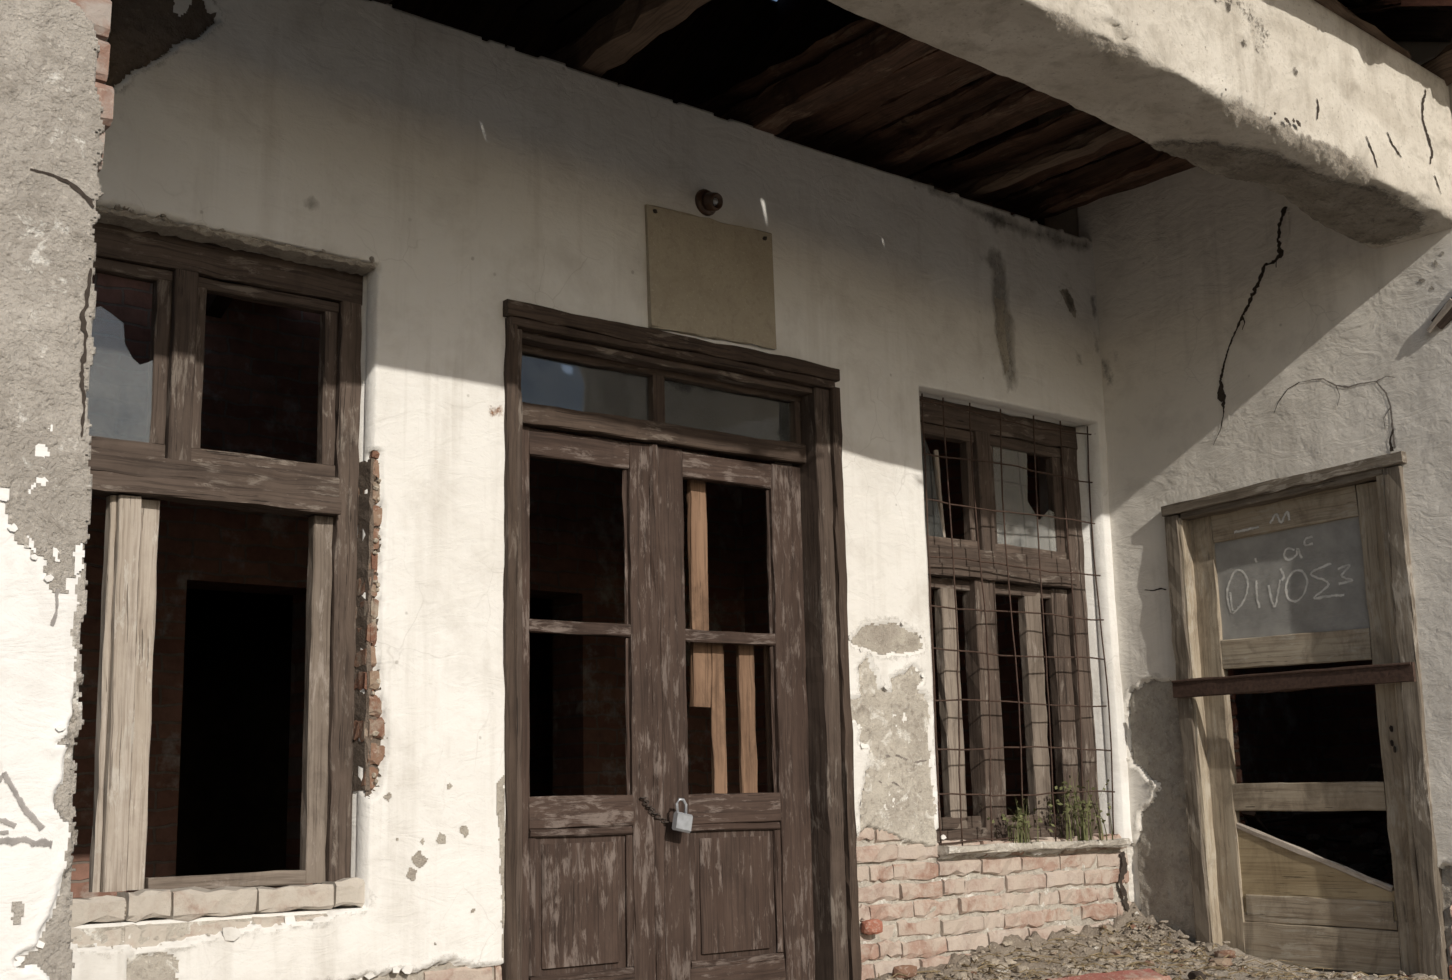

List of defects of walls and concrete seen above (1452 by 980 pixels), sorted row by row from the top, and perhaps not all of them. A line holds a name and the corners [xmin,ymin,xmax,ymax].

crack [1366,90,1441,193]
peeling [0,0,376,626]
leakage [990,255,1014,381]
crack [1213,206,1290,445]
crack [1274,376,1396,452]
spalling [353,450,392,802]
peeling [54,693,77,824]
flaking render [848,619,1196,980]
peeling [11,901,25,925]
flaking render [14,871,365,980]
flaking render [351,775,506,980]
flaking render [1442,865,1452,980]